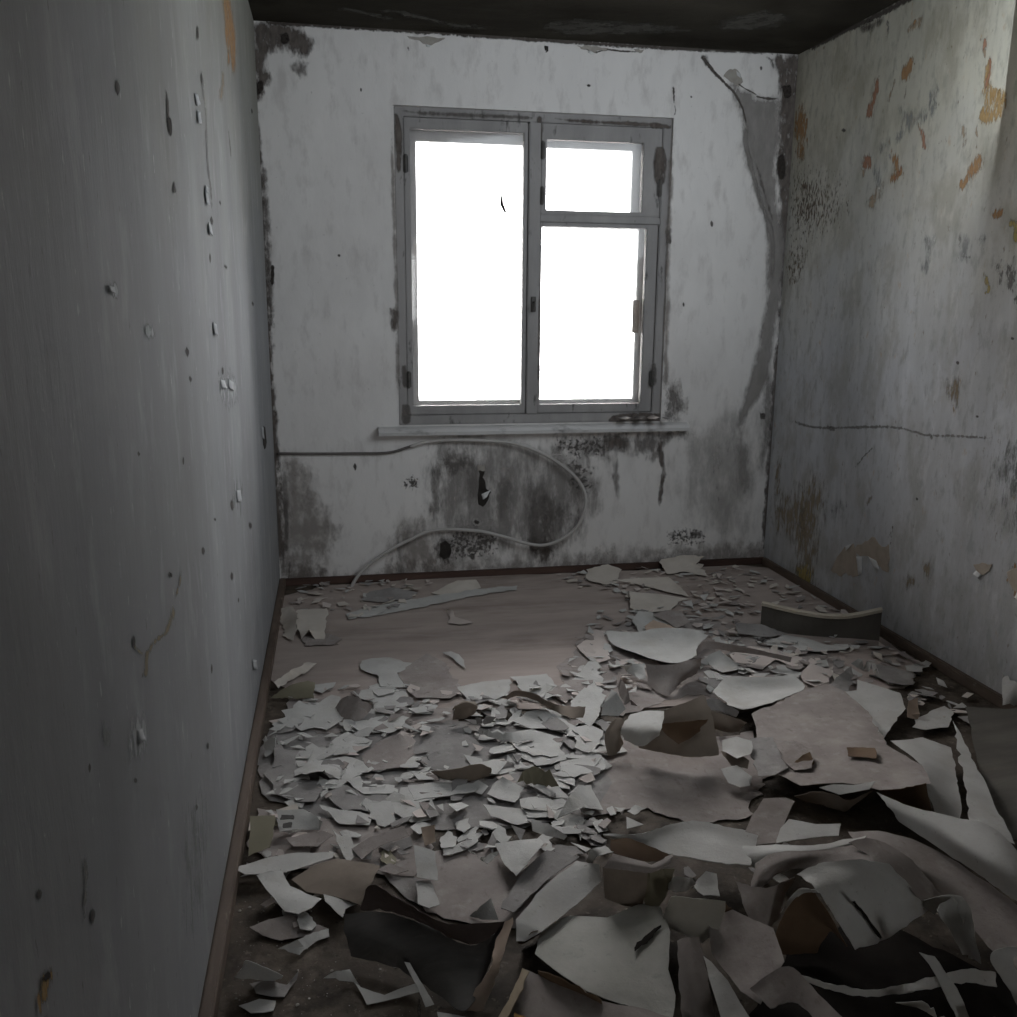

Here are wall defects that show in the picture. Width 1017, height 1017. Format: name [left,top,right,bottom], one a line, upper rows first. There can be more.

leakage [254,22,314,100]
flaking render [724,69,743,87]
peeling [866,56,914,118]
peeling [961,39,1007,143]
peeling [862,93,935,208]
peeling [959,154,984,191]
leakage [390,280,399,330]
leakage [259,127,329,578]
leakage [664,302,683,417]
crack [795,421,985,465]
leakage [386,431,684,574]